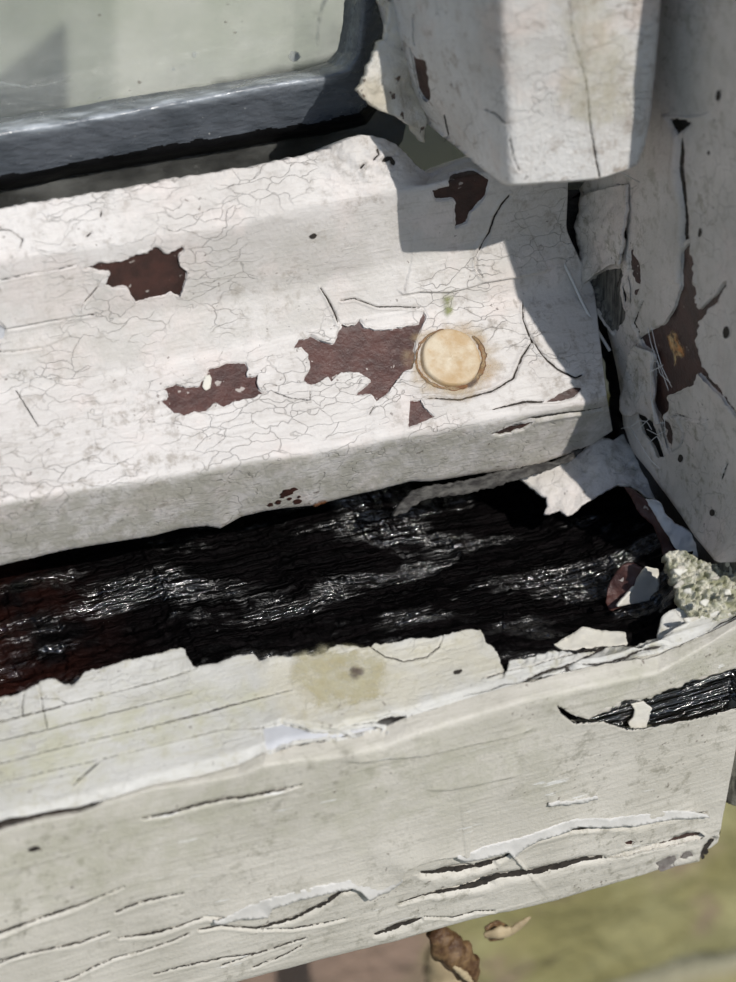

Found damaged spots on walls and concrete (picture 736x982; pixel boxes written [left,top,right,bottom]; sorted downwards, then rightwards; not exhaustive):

peeling [83,246,189,304]
peeling [161,361,266,418]
peeling [292,310,428,406]
crack [320,288,416,322]
corrosion [415,329,489,393]
crack [427,304,601,420]
peeling [619,228,736,462]
peeling [519,434,698,557]
peeling [657,608,687,640]
crack [0,672,303,825]
crack [0,886,353,982]
crack [374,853,602,935]